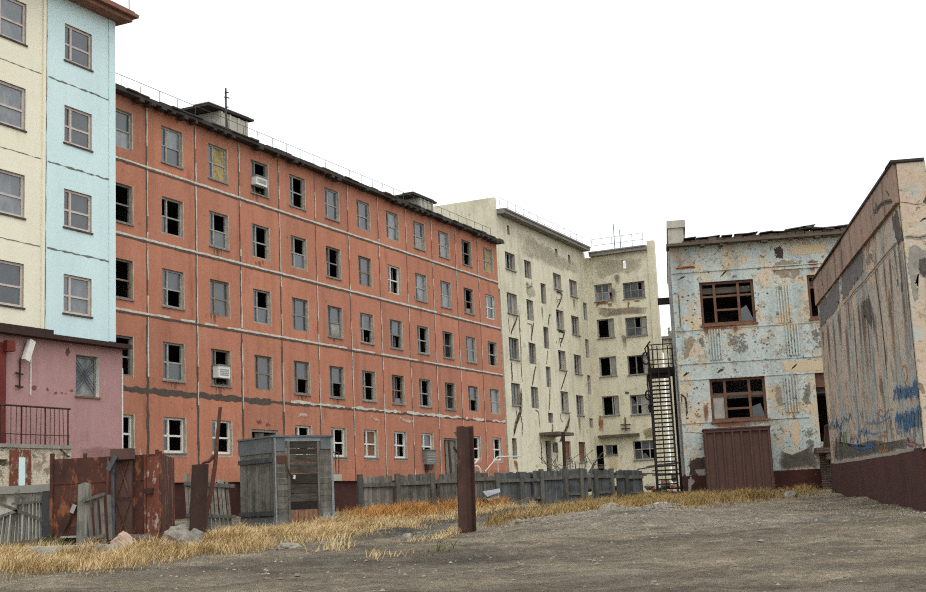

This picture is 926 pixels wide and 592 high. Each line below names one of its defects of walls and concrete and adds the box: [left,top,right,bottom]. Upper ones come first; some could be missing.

peeling [766,240,831,282]
crack [841,199,926,375]
damp [883,249,908,301]
peeling [667,327,707,367]
peeling [724,326,769,356]
peeling [773,242,873,412]
damp [853,301,877,362]
peeling [791,421,817,449]
peeling [19,454,40,486]